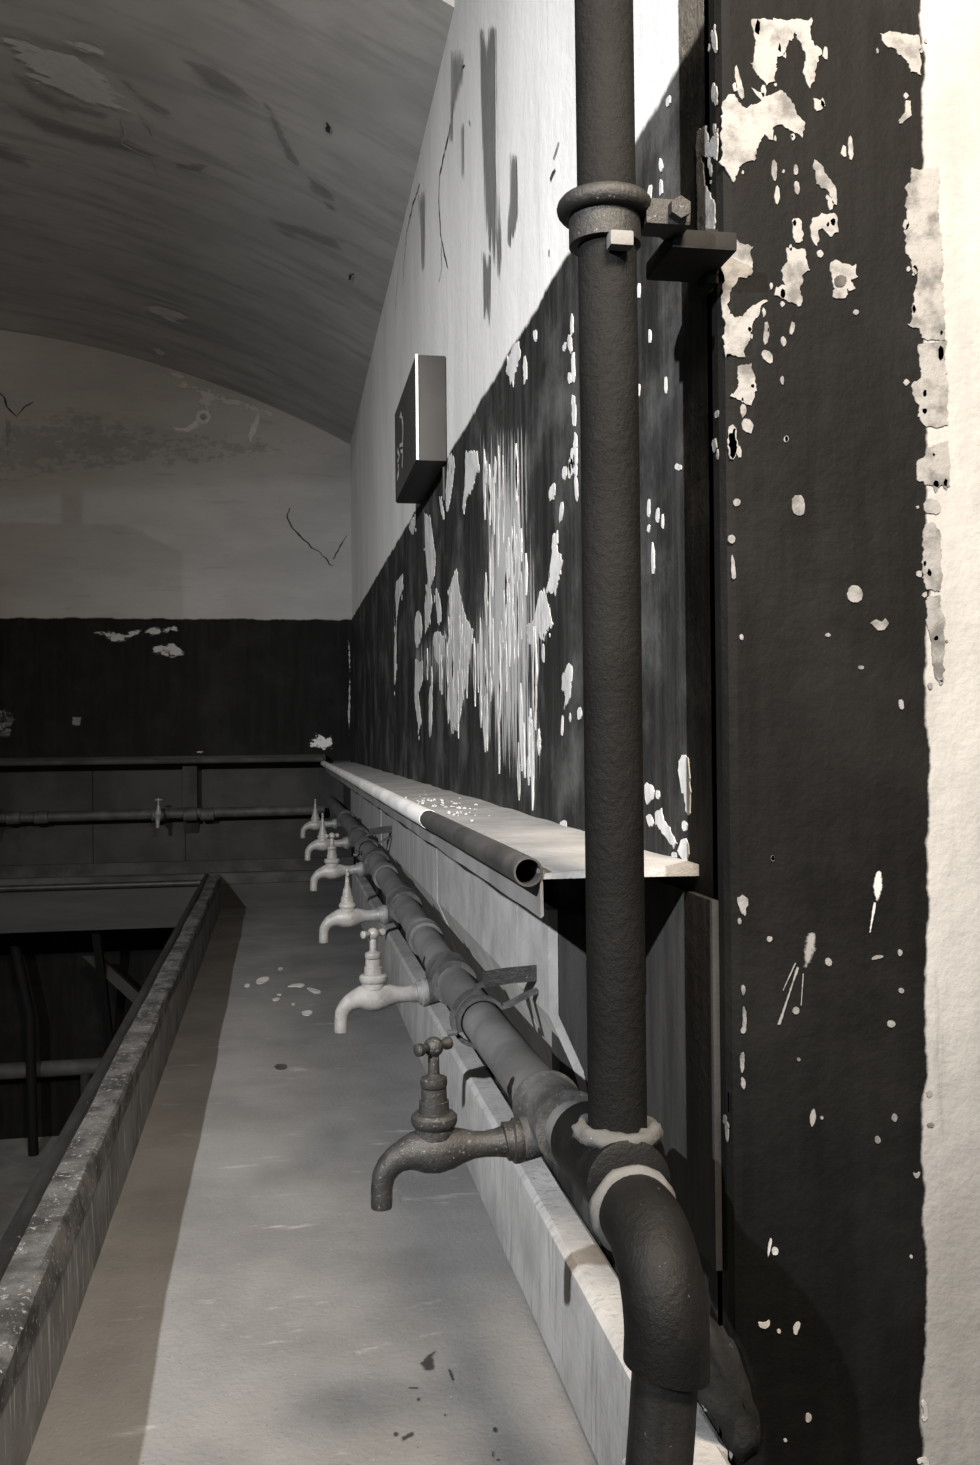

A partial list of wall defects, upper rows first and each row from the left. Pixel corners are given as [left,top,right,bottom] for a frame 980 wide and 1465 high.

peeling [876,31,928,76]
peeling [898,92,912,124]
leakage [449,28,517,321]
peeling [647,158,663,198]
peeling [696,17,859,460]
crack [0,393,34,416]
peeling [902,167,950,689]
crack [286,508,347,566]
peeling [394,313,582,810]
peeling [97,626,183,656]
peeling [644,755,692,861]
peeling [758,1320,800,1335]